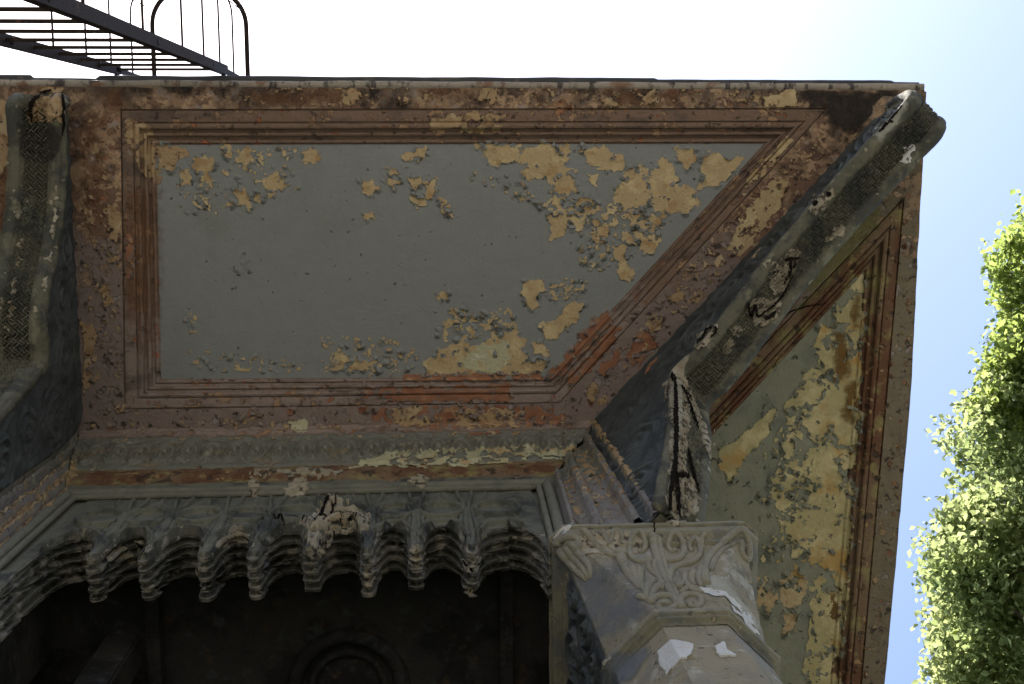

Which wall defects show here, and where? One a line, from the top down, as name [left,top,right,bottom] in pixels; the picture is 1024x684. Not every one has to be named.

water stain [798,90,906,140]
peeling [82,118,321,280]
peeling [243,82,826,560]
crack [653,371,700,532]
peeling [657,243,913,684]